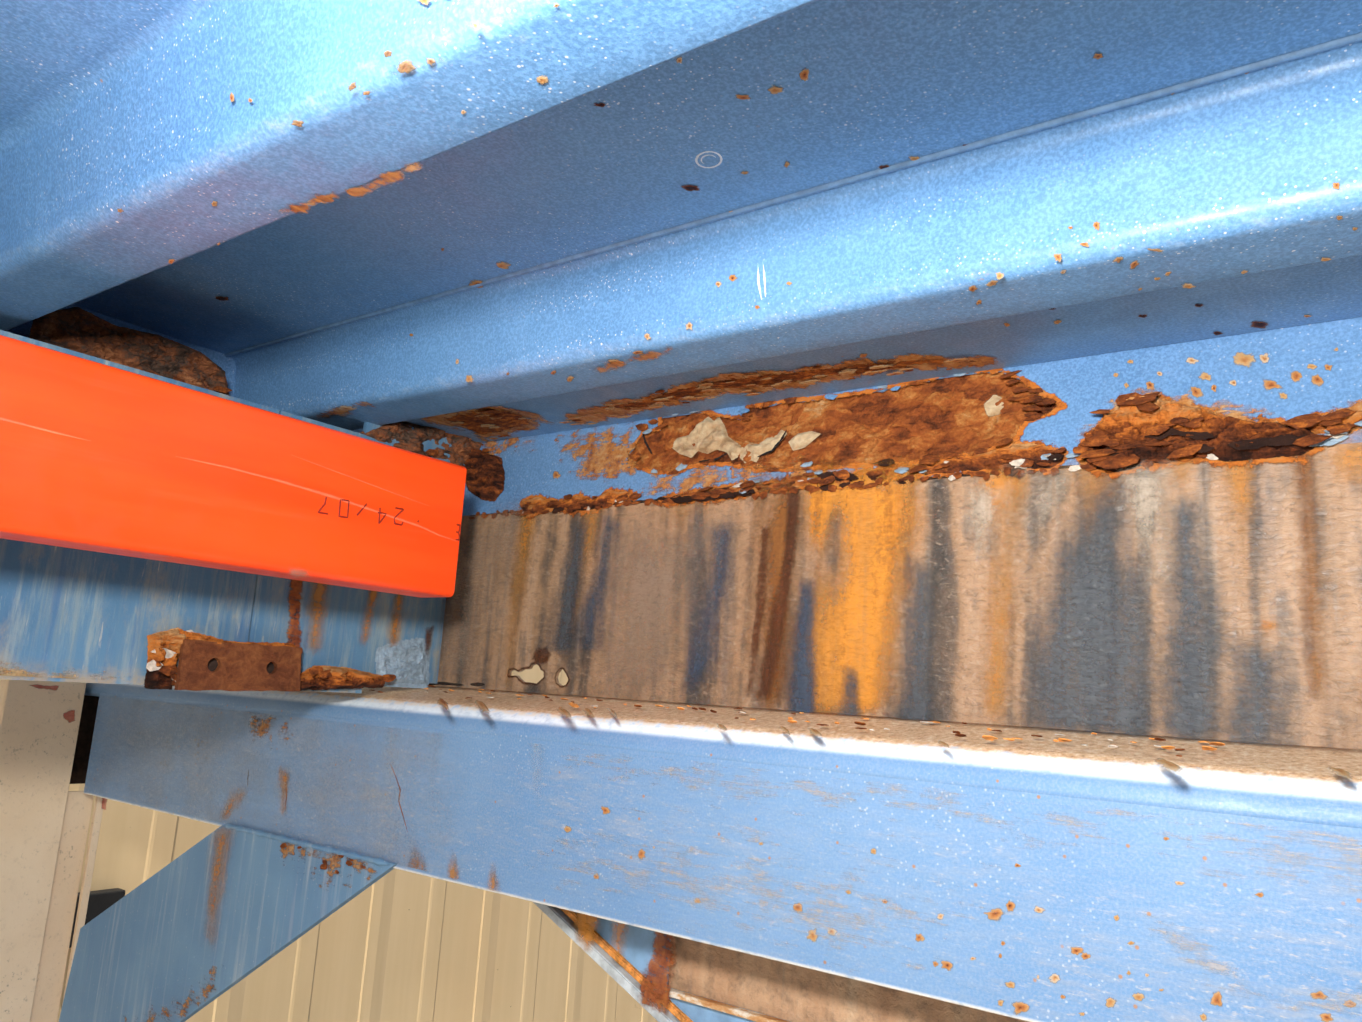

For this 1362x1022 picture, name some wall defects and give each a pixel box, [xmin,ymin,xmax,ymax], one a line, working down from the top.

rust [286,163,421,213]
rust [598,333,670,373]
spalling [619,368,1081,488]
peeling [1310,430,1349,446]
rust [422,348,1362,713]
rust [144,579,326,690]
rust [984,900,1015,921]
rust [559,908,693,1022]
rust [1071,947,1090,960]
rust [998,981,1029,1015]
rust [1200,991,1222,1021]
rust [1310,991,1356,1022]